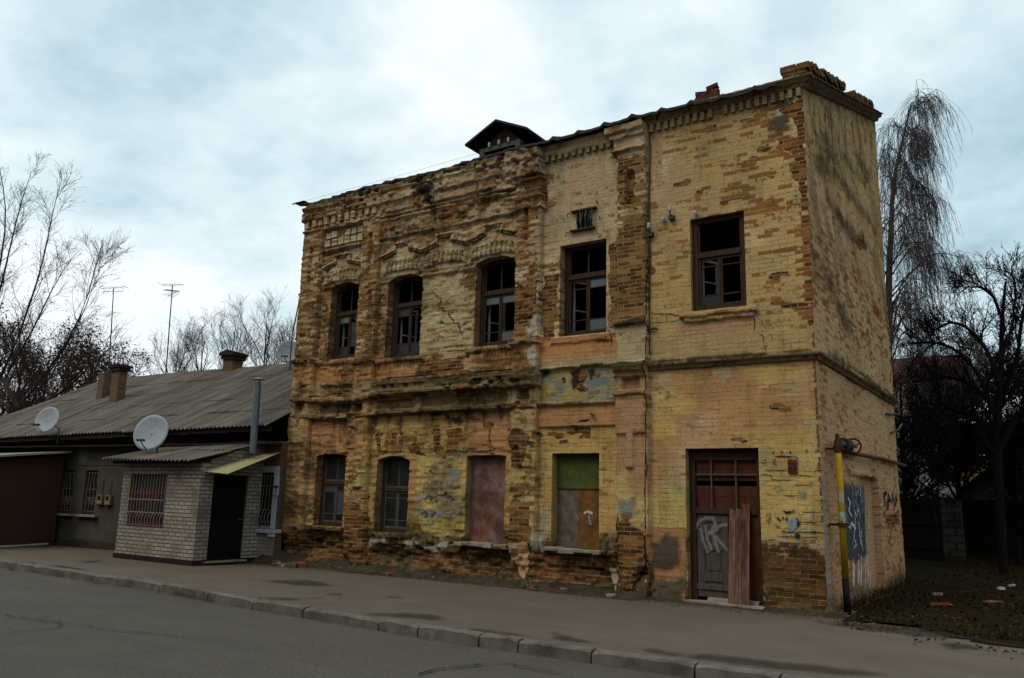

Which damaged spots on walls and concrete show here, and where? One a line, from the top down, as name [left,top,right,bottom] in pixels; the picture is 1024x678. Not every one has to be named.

peeling [521,166,557,207]
crack [418,289,470,362]
peeling [562,369,601,392]
spalling [507,425,591,468]
spalling [408,485,644,589]
damp [645,534,686,599]